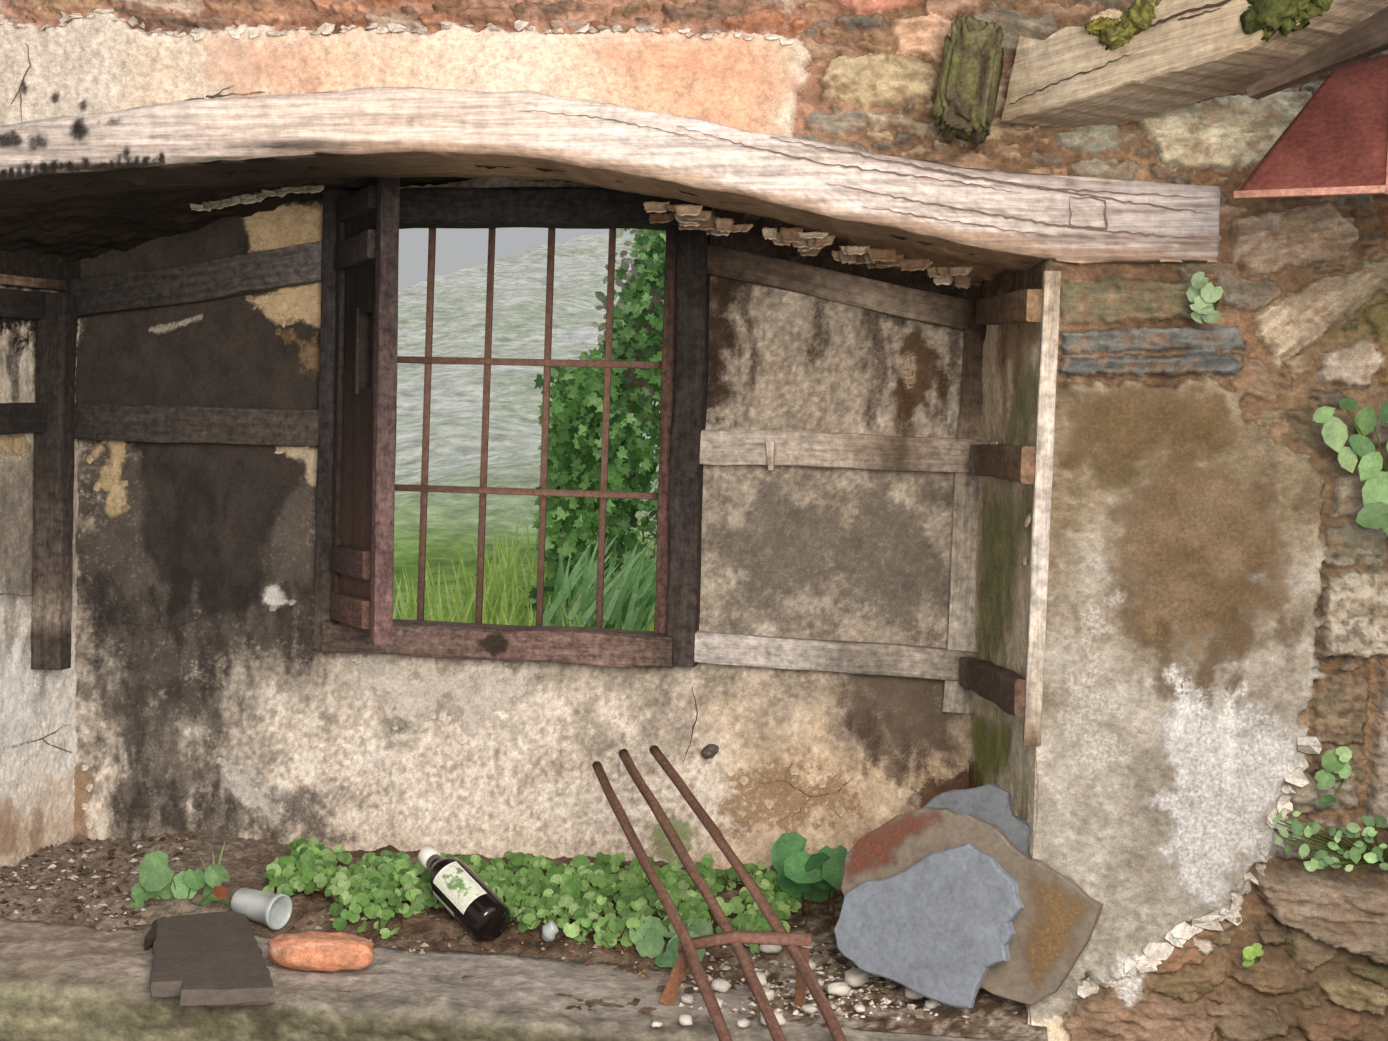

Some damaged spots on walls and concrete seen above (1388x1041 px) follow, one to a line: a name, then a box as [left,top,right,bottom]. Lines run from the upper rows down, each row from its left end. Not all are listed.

water stain [6,326,37,400]
flaking render [246,282,321,379]
flaking render [86,440,132,517]
water stain [89,478,257,840]
water stain [1057,382,1303,905]
spalling [1077,736,1322,998]
water stain [1115,954,1143,1004]